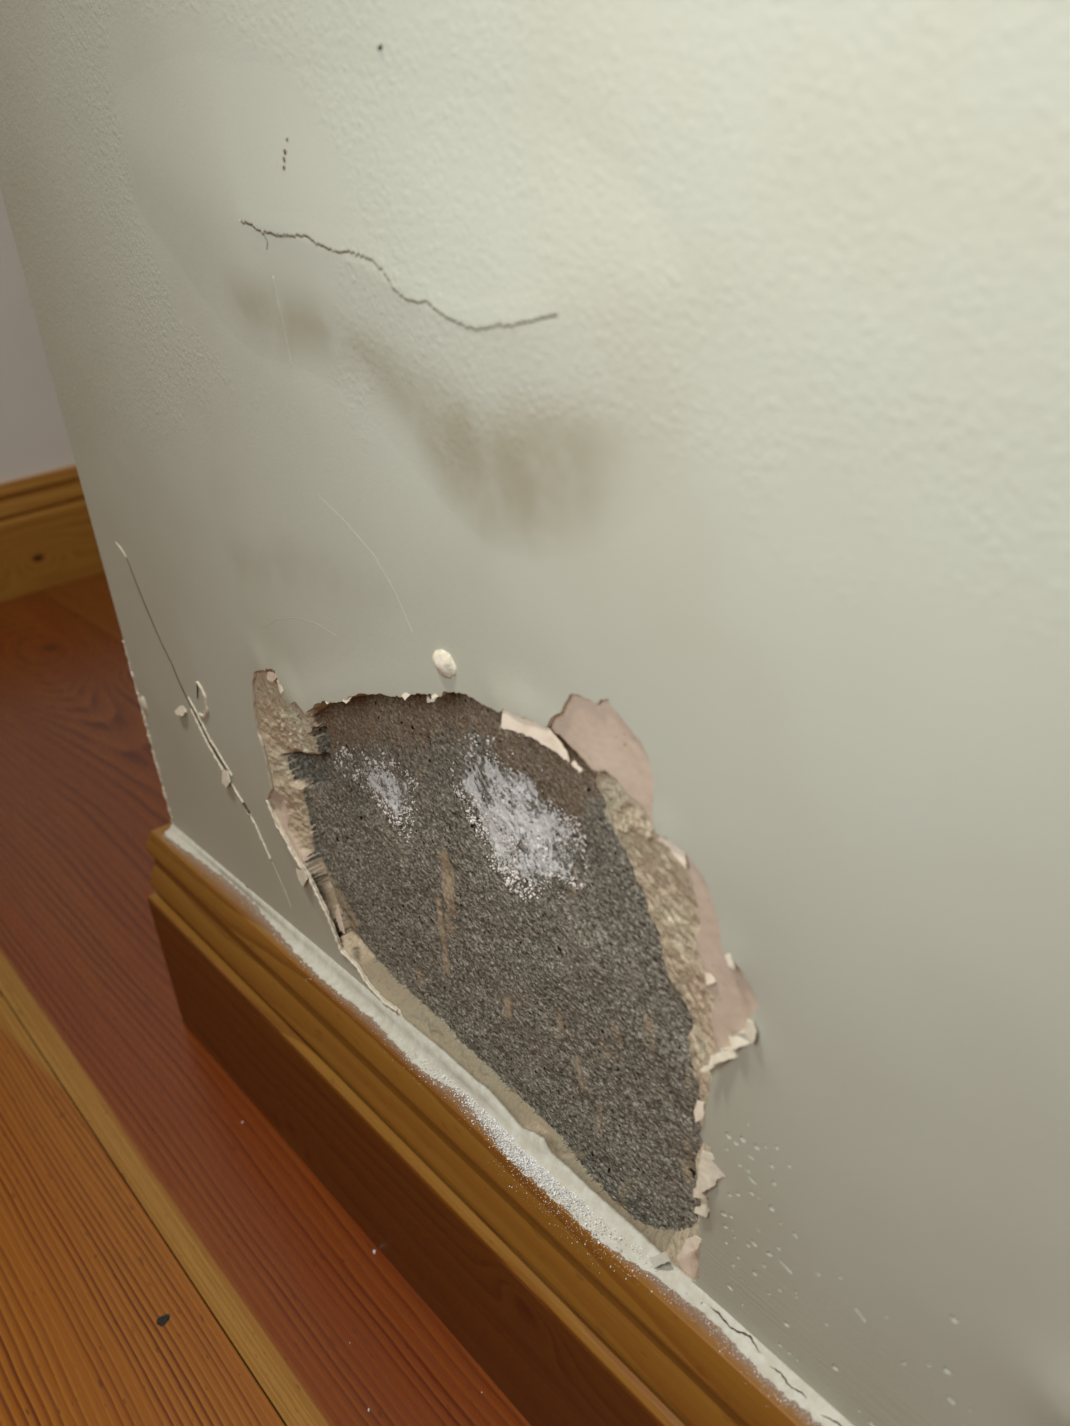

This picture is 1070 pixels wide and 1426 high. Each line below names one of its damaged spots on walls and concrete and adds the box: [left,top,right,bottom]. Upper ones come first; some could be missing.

crack [236,199,558,331]
flaking render [254,669,792,1280]